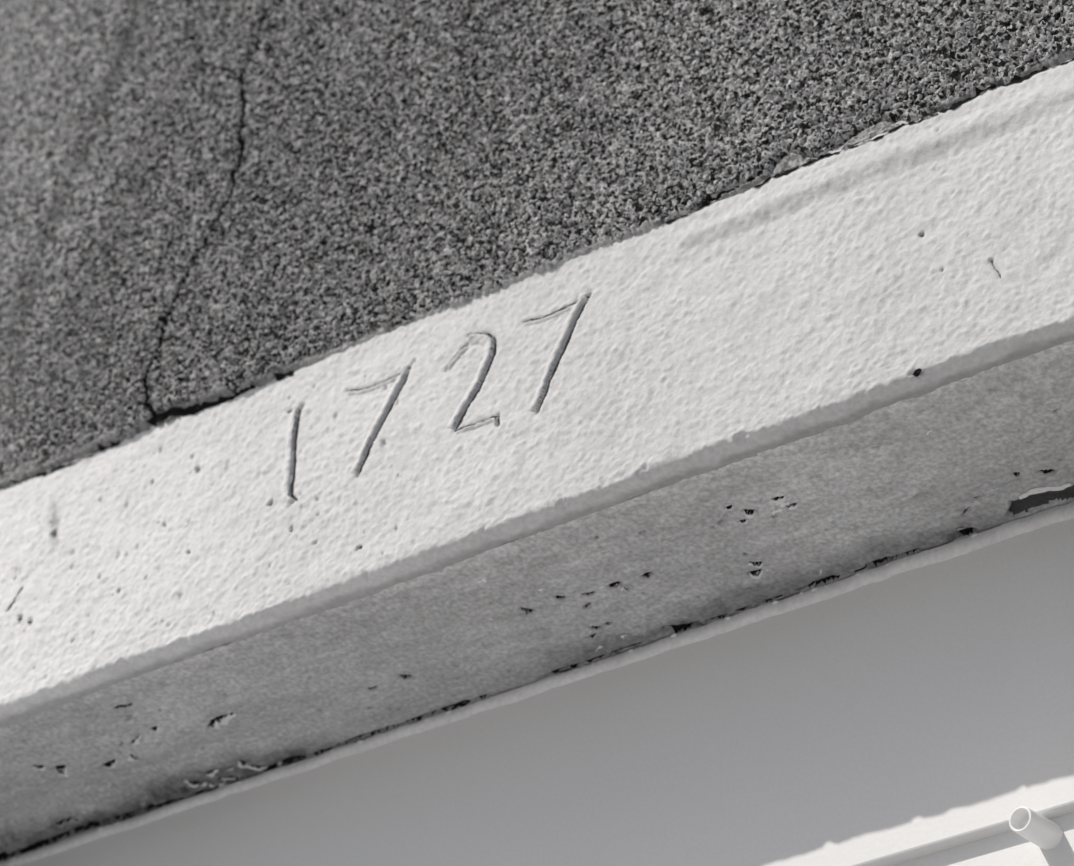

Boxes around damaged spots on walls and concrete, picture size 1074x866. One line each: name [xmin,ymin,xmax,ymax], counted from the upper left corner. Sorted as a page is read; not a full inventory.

crack [132,0,281,418]